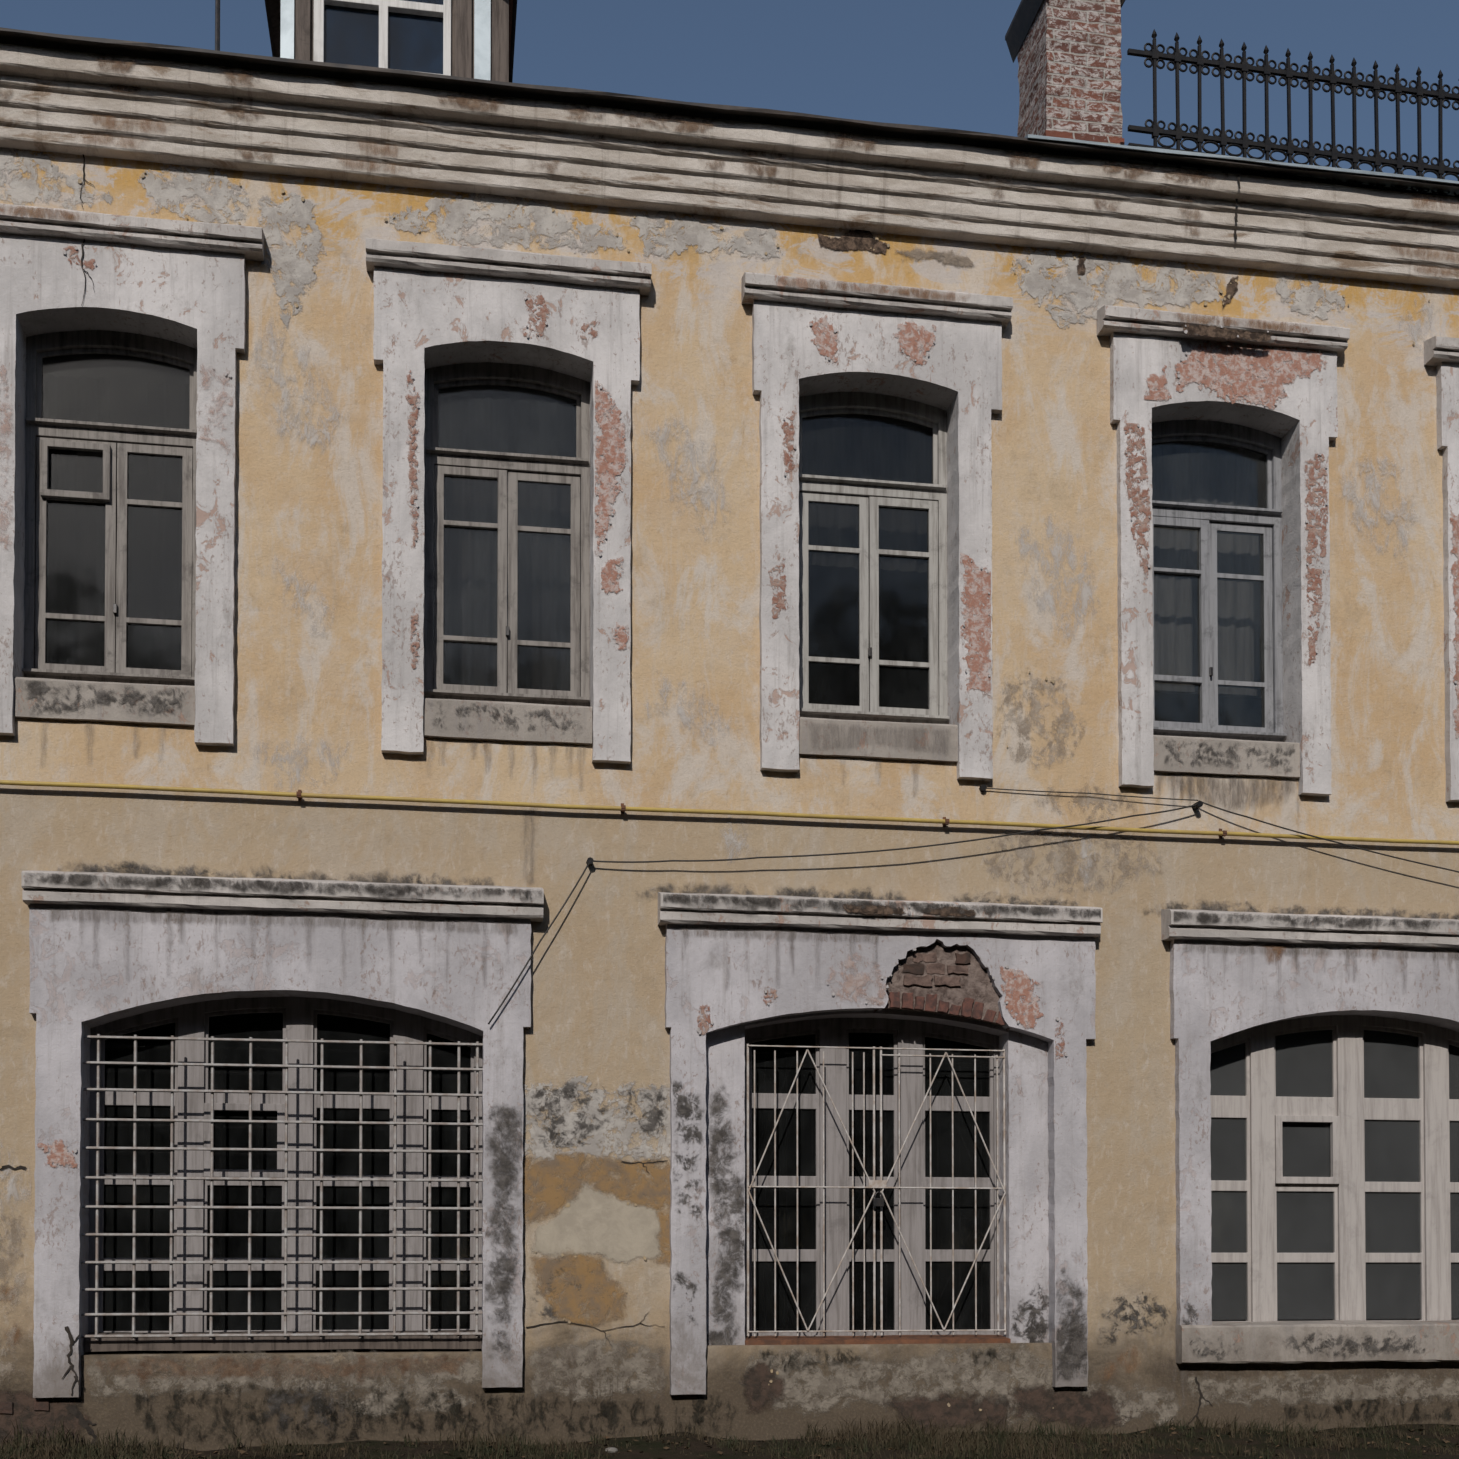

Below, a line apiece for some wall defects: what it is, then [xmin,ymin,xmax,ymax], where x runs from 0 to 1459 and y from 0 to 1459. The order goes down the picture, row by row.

peeling [138,164,327,328]
peeling [384,192,781,261]
peeling [1012,249,1327,410]
peeling [595,380,627,594]
peeling [1124,423,1152,578]
peeling [1304,453,1412,665]
peeling [960,553,1080,766]
flaking render [873,941,1068,1059]
peeling [522,1153,671,1325]
damp [486,1075,744,1353]
crack [62,1326,101,1445]
damp [87,1339,735,1447]